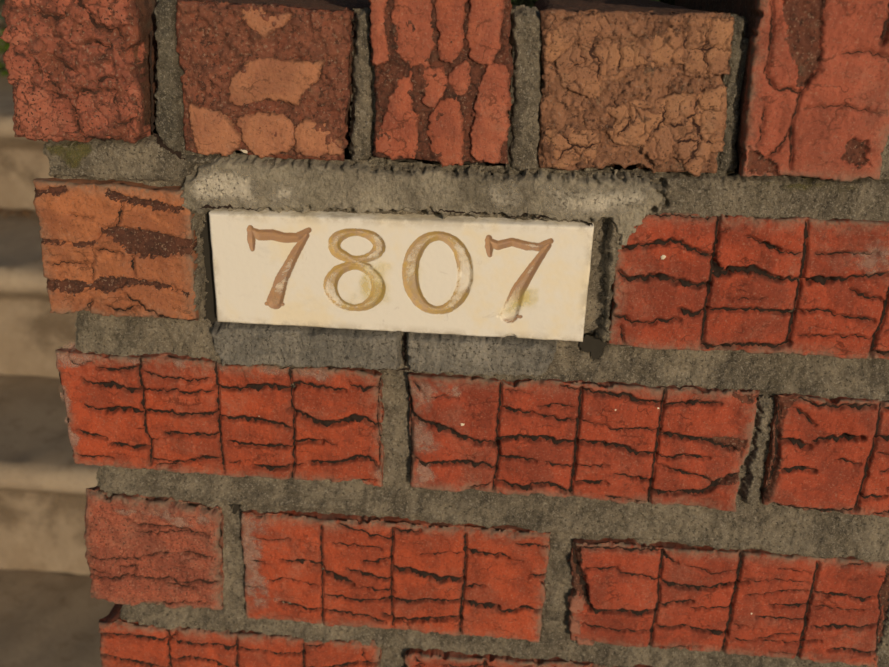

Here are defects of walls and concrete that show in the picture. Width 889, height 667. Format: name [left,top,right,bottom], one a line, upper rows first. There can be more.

spalling [0,0,151,142]
spalling [177,0,354,160]
spalling [368,0,512,167]
crack [546,128,595,160]
crack [568,43,622,78]
crack [617,99,720,165]
crack [683,22,727,72]
crack [756,0,889,168]